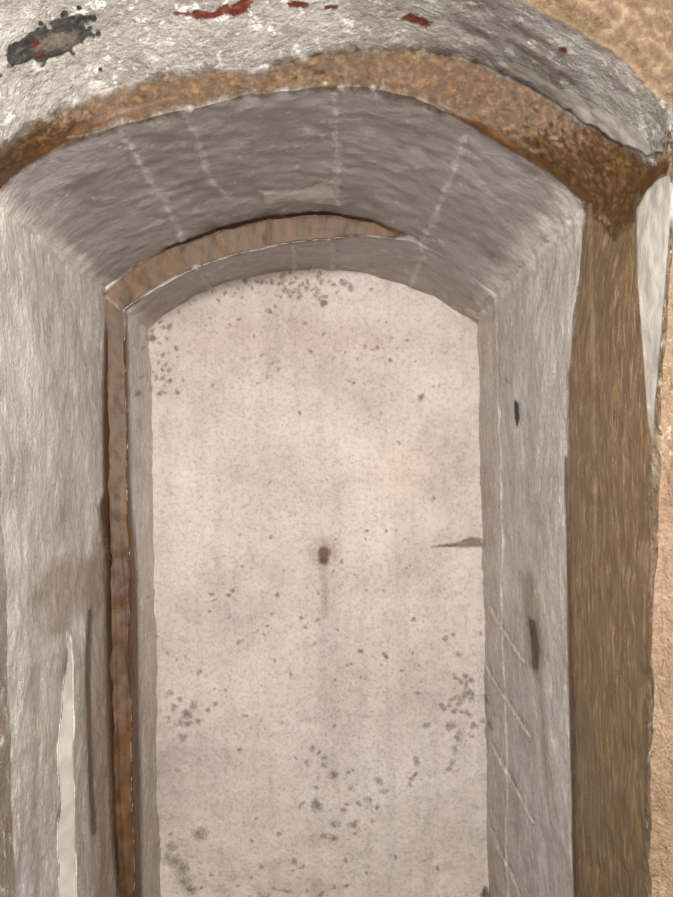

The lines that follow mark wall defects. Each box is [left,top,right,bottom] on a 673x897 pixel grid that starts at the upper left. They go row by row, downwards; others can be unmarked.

spalling [0,5,101,77]
water stain [0,46,651,237]
water stain [100,211,404,897]
rust [319,548,328,564]
water stain [565,194,650,897]
water stain [86,609,96,835]